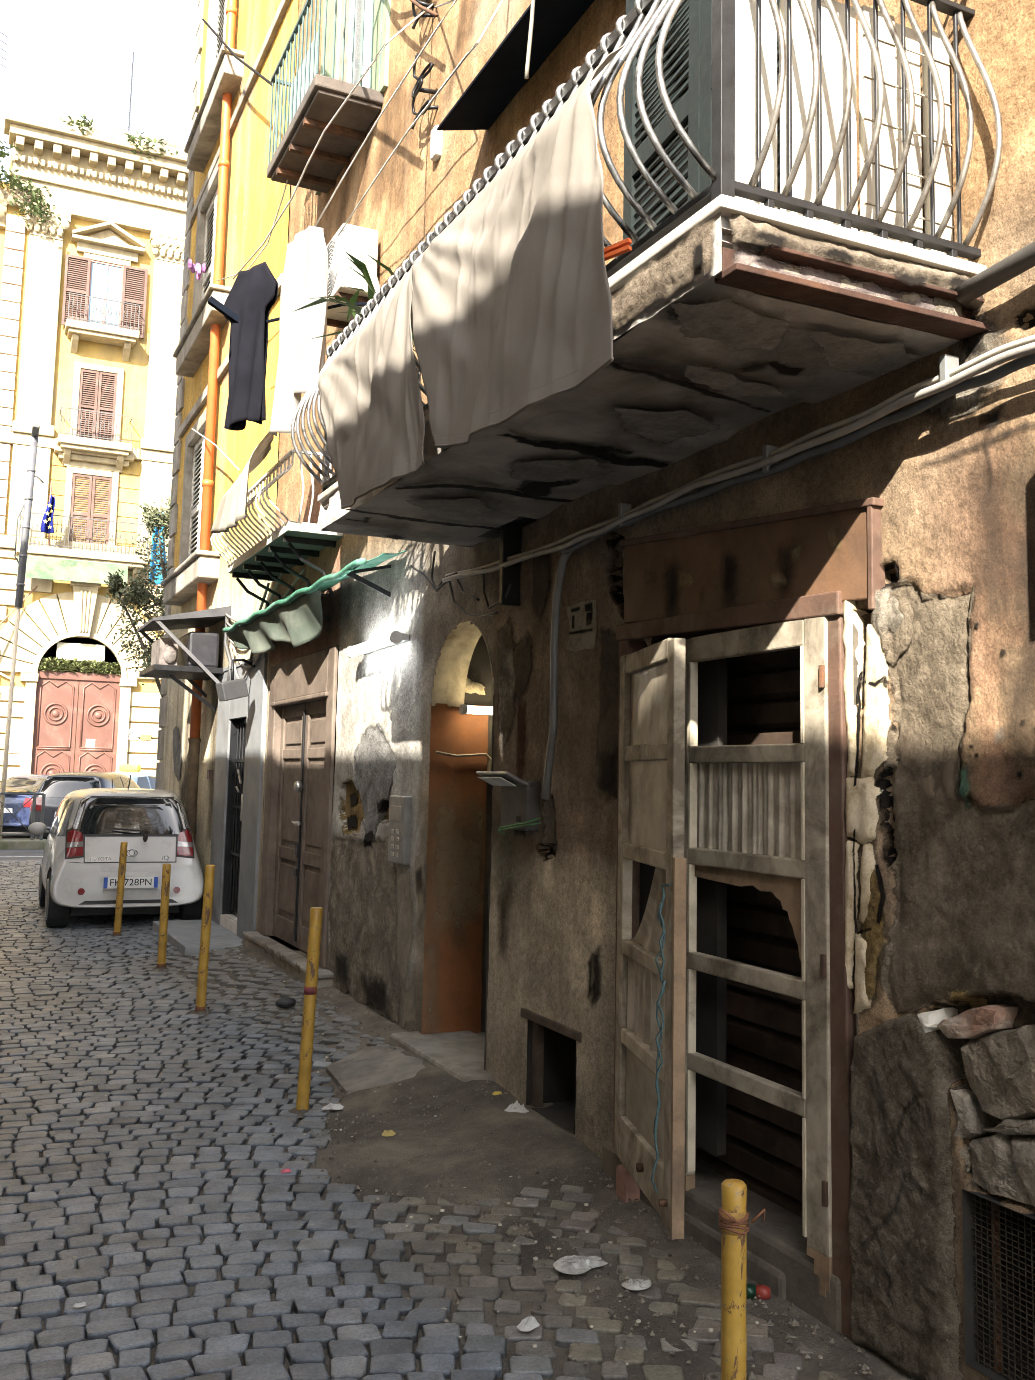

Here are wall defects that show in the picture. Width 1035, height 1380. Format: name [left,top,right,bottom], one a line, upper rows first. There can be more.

peeling [510,459,613,482]
peeling [613,408,720,443]
peeling [611,214,1003,429]
flaking render [1015,309,1035,328]
peeling [328,723,426,1028]
flaking render [843,563,1035,1220]